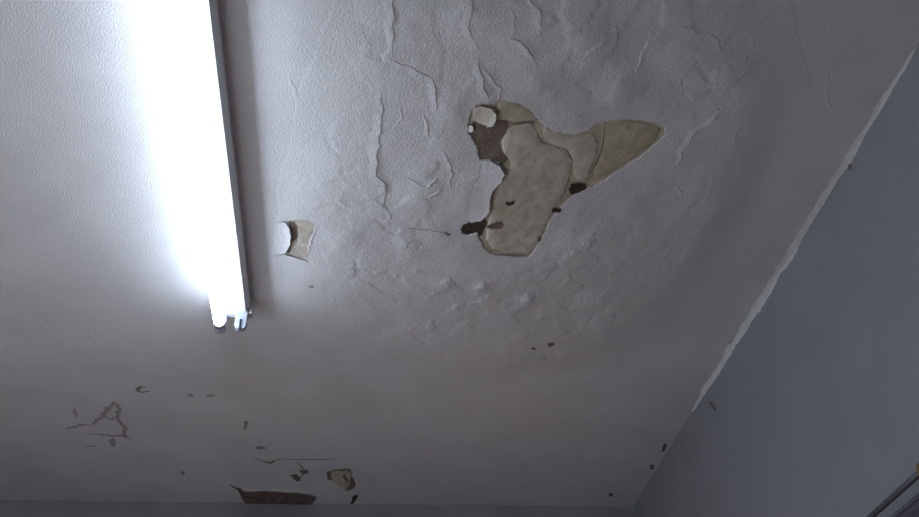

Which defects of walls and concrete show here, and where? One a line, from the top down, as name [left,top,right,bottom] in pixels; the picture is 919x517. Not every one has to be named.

peeling [366,91,392,226]
peeling [383,0,453,201]
peeling [459,0,666,257]
peeling [273,220,318,264]
flaking render [230,461,317,505]
flaking render [326,469,358,504]